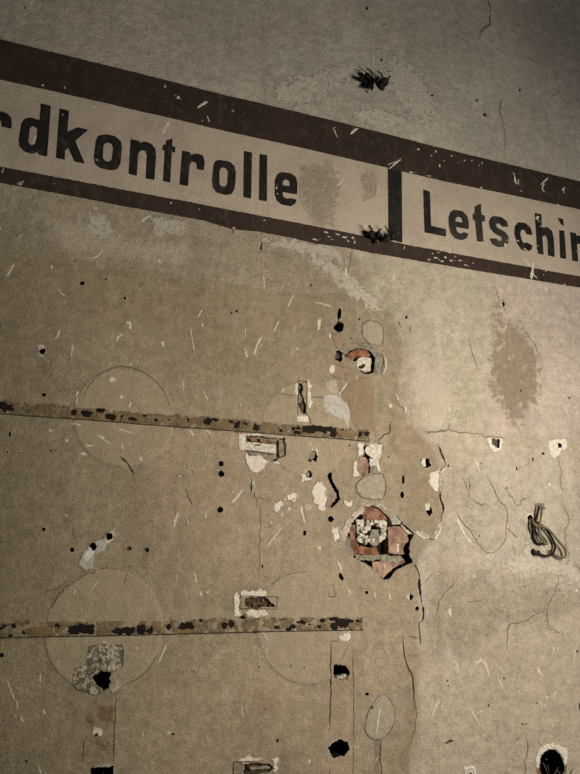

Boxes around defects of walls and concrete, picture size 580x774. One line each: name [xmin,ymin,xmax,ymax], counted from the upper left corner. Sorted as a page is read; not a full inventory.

spalling [327,331,387,383]
water stain [482,291,547,436]
rust [0,398,372,445]
spalling [237,433,286,493]
crack [422,427,507,439]
spalling [270,470,329,524]
crack [456,476,529,556]
spalling [330,442,450,697]
crack [505,462,580,652]
rust [0,613,366,641]
spalling [73,644,124,695]
crack [329,640,396,774]